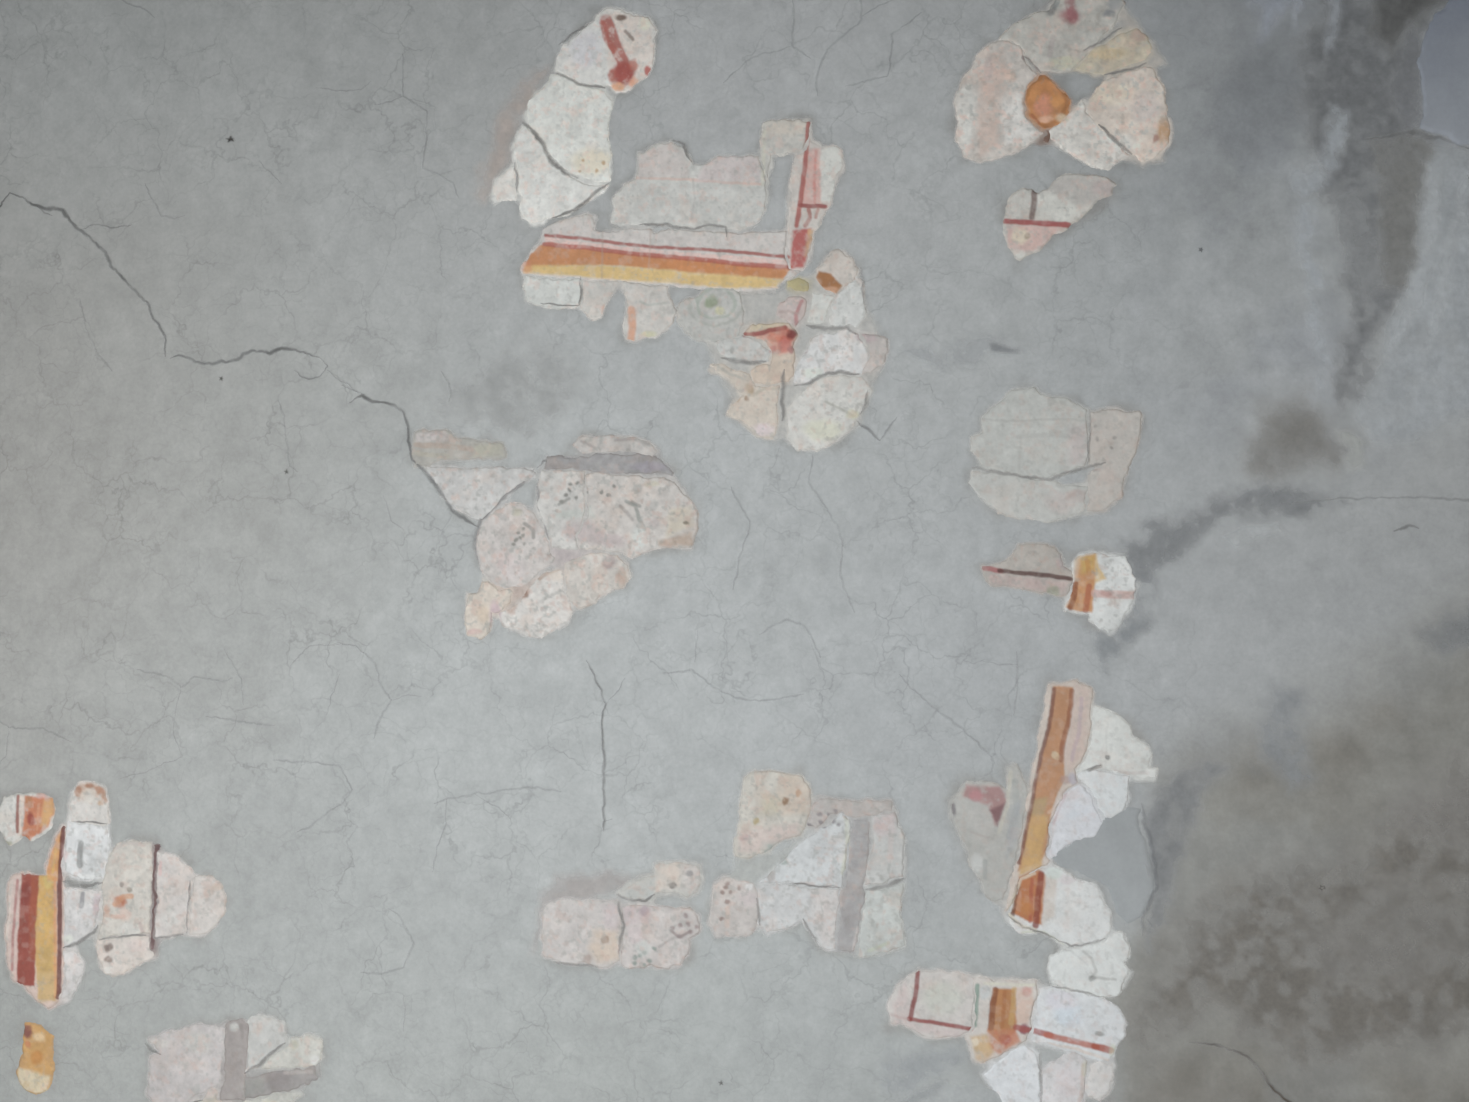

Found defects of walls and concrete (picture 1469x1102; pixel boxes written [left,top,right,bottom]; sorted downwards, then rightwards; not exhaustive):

crack [0,192,312,379]
water stain [1127,0,1469,582]
crack [350,395,486,527]
water stain [1096,609,1149,662]
crack [590,668,606,829]
water stain [1135,759,1469,1066]
crack [1203,1043,1291,1102]